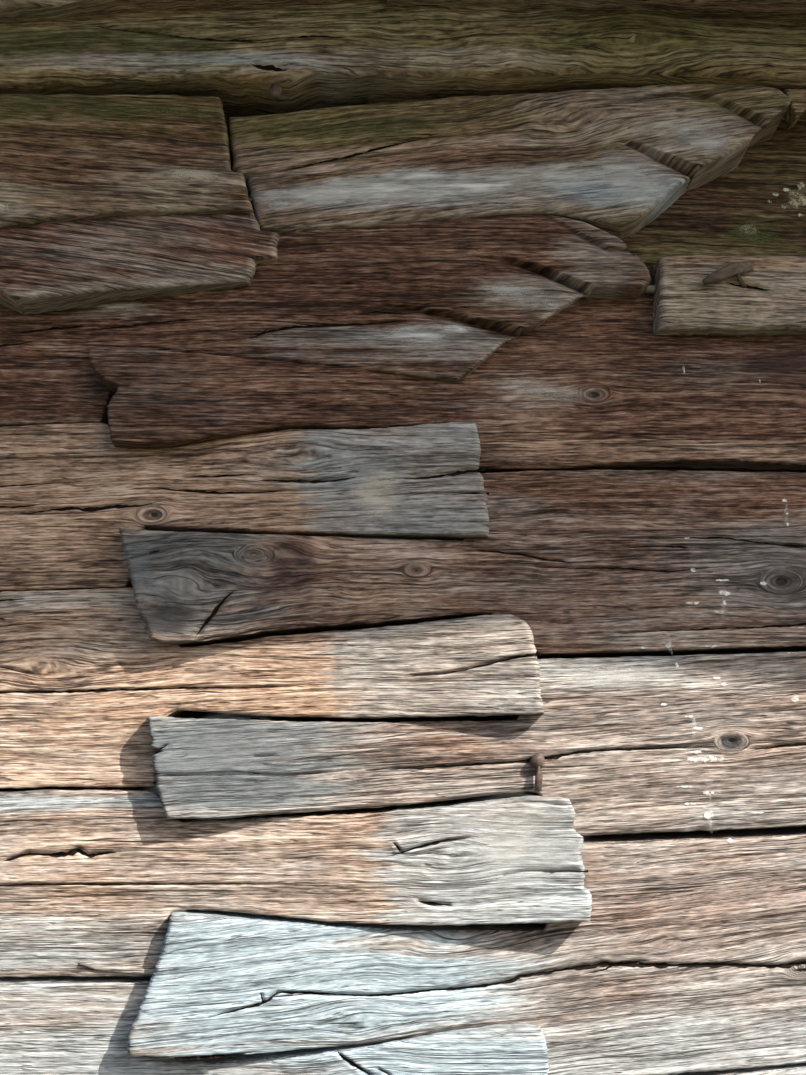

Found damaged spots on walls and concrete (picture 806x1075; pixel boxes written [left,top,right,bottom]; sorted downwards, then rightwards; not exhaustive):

crack [195,591,234,637]
crack [0,849,297,886]
crack [211,961,806,1017]
crack [338,1052,390,1075]